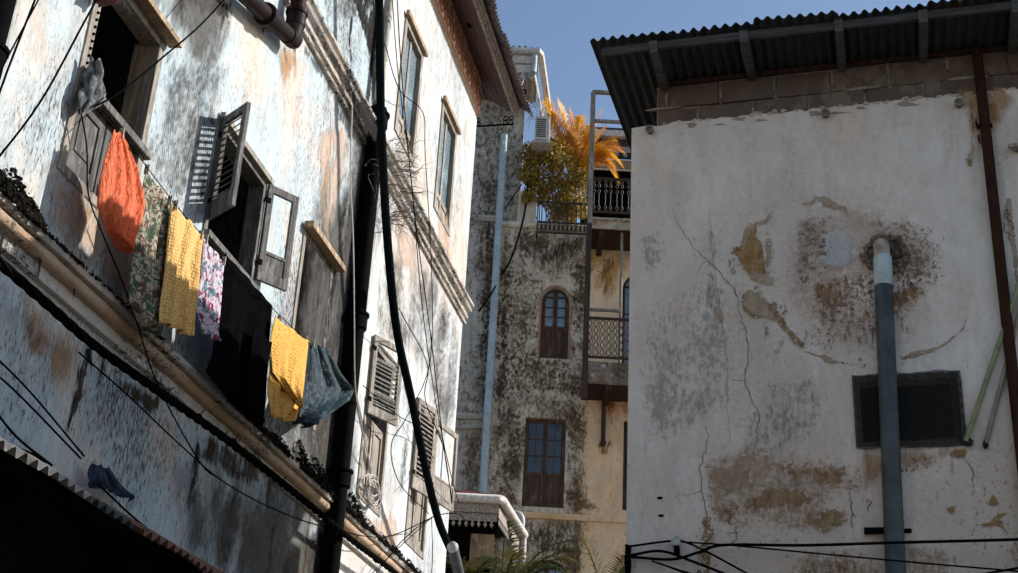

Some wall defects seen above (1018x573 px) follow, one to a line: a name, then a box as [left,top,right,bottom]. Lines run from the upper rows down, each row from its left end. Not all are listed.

water stain [301,0,377,372]
water stain [287,410,337,473]
water stain [378,252,458,425]
water stain [463,176,620,573]
crack [673,211,761,547]
spalling [729,212,866,367]
water stain [796,215,876,350]
water stain [874,220,944,330]